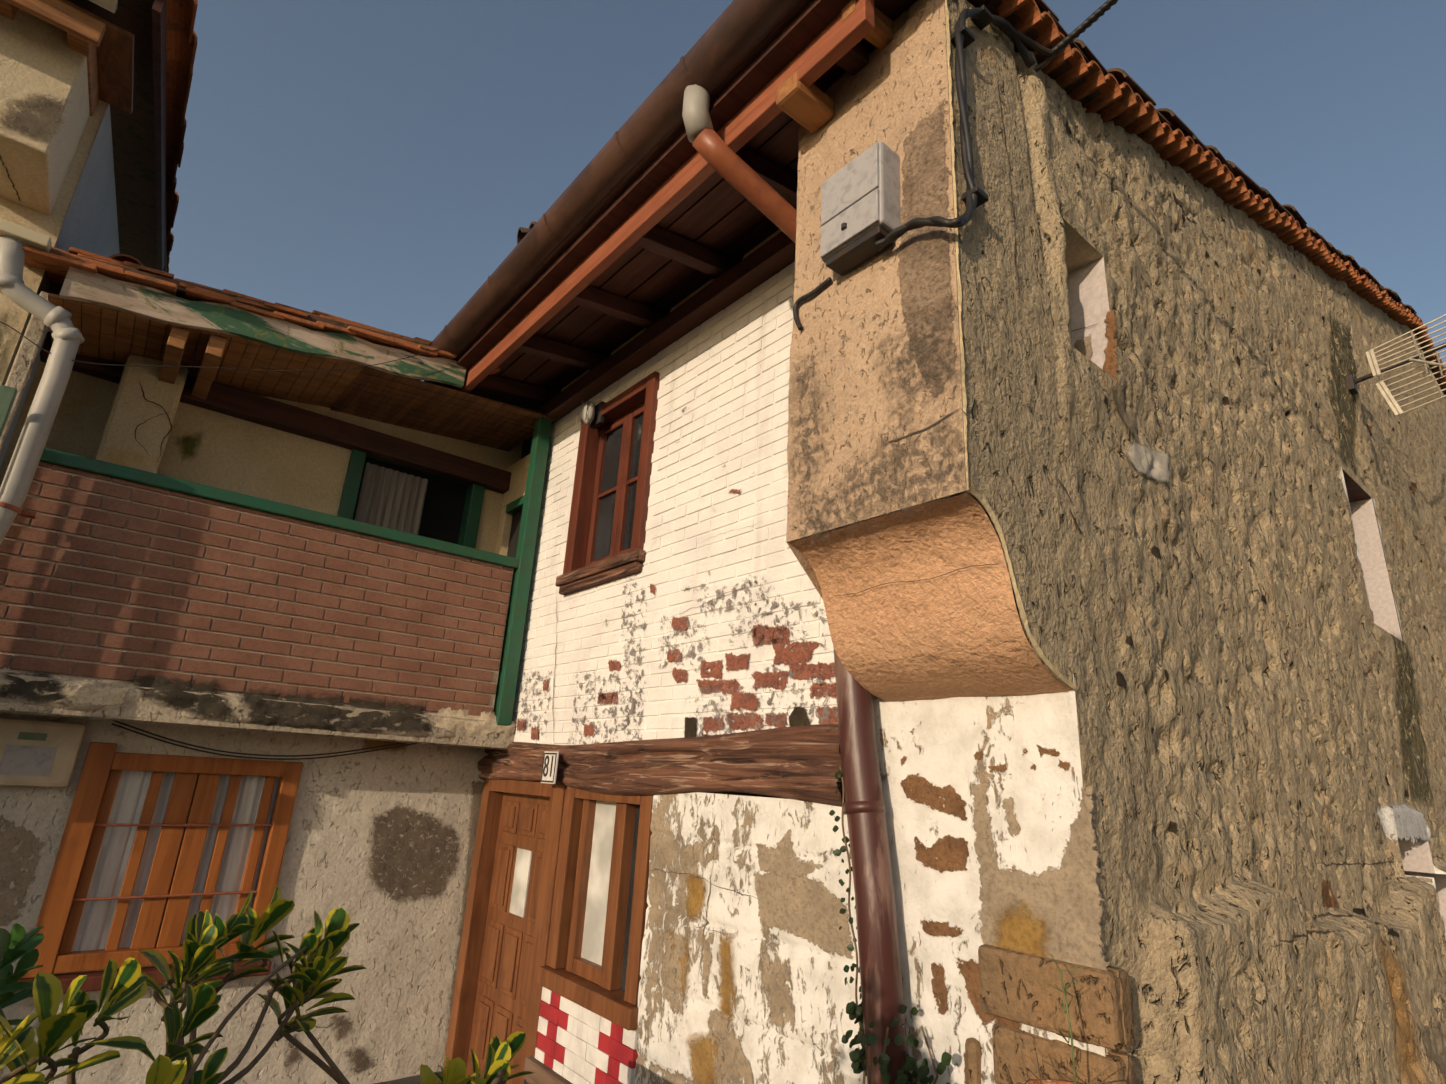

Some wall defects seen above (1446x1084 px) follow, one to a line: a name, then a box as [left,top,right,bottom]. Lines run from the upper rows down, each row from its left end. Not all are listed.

leakage [0,94,65,140]
crack [0,155,21,201]
leakage [0,672,66,705]
leakage [133,676,431,733]
peeling [568,659,645,745]
peeling [658,571,838,738]
leakage [369,806,459,901]
flaking render [753,829,853,959]
flaking render [901,751,1110,971]
crack [1271,912,1359,947]
crack [1324,855,1444,866]
peeling [931,958,1020,1031]